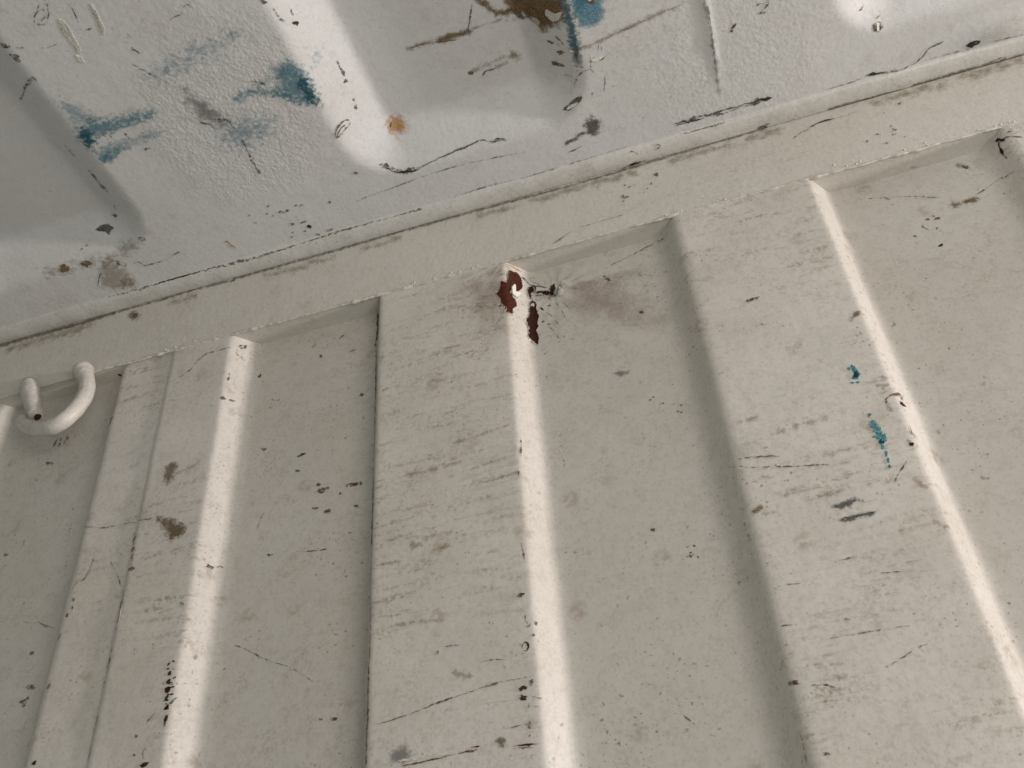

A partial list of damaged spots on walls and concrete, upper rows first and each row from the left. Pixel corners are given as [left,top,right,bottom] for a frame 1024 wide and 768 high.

peeling [545,9,562,22]
peeling [157,517,186,539]
peeling [147,660,178,726]